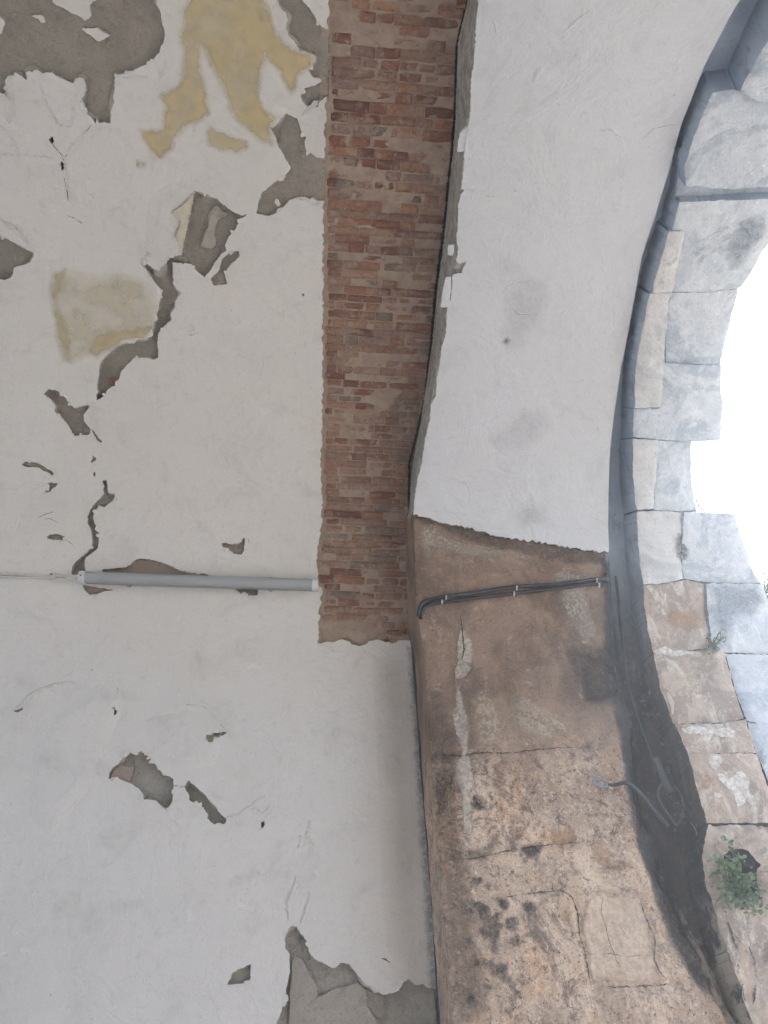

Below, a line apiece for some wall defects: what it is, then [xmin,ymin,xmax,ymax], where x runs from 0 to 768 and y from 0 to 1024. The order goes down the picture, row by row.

peeling [0,0,165,122]
damp [143,0,310,156]
peeling [279,0,330,106]
crack [1,88,91,223]
peeling [0,217,34,279]
peeling [46,114,326,442]
spalling [109,751,226,826]
damp [435,616,533,945]
crack [436,736,582,756]
damp [523,845,541,856]
spalling [277,926,436,1024]
crack [497,890,667,988]